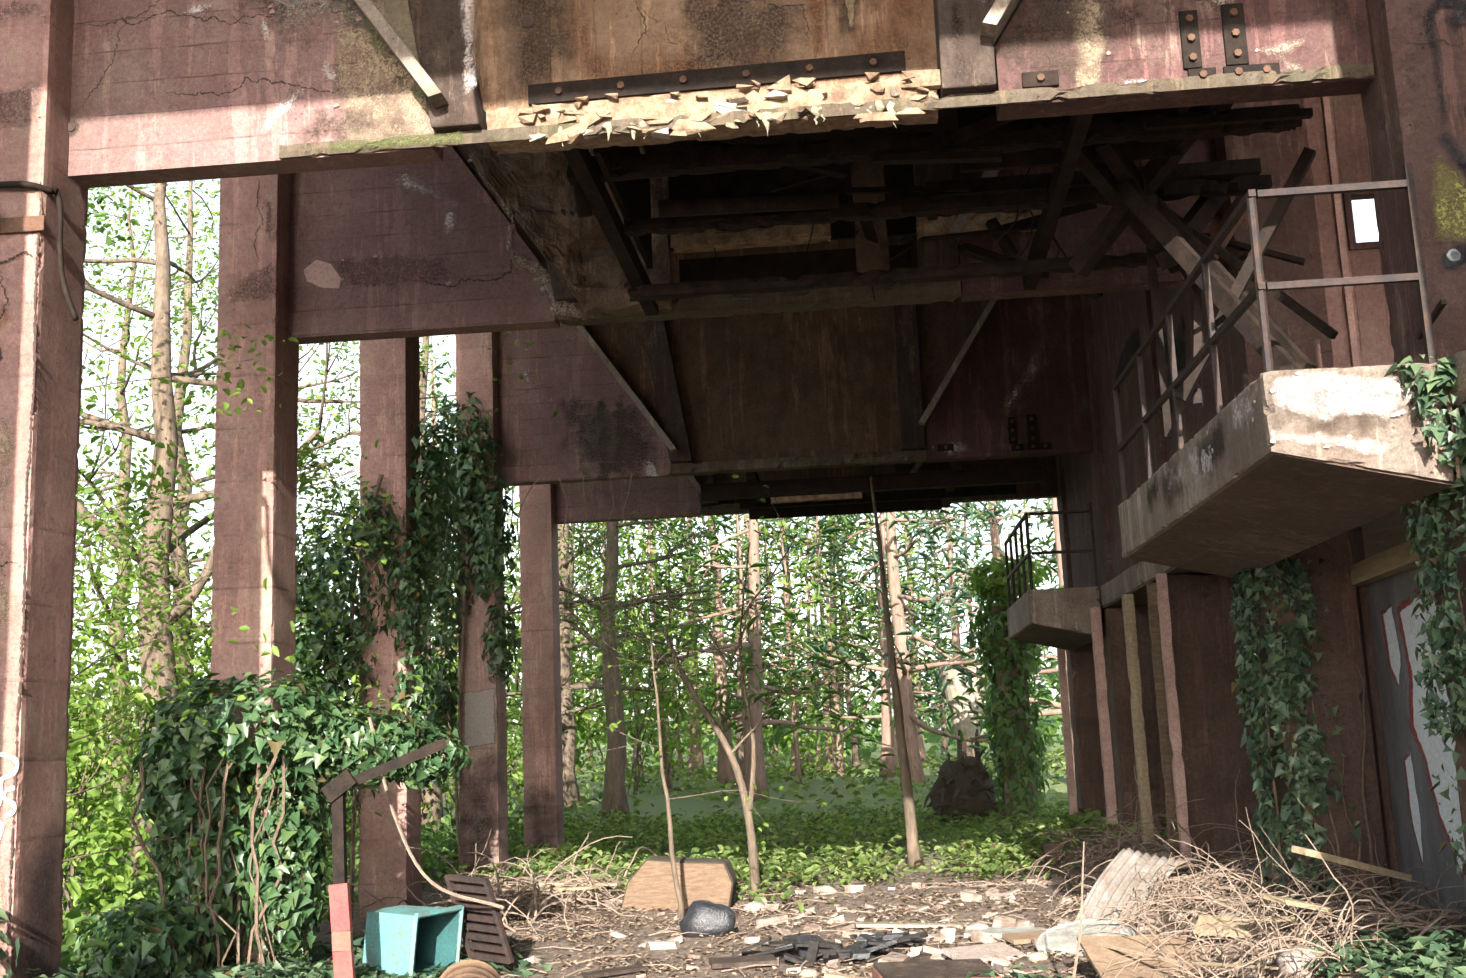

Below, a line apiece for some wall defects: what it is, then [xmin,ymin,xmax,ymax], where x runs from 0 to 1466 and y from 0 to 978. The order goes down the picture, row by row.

crack [83,0,407,111]
water stain [509,0,571,87]
crack [633,0,692,51]
water stain [687,0,860,70]
crack [738,0,813,43]
spalling [853,69,941,128]
spalling [468,75,828,320]
peeling [1232,371,1415,426]
peeling [1270,434,1385,453]
crack [0,181,41,963]